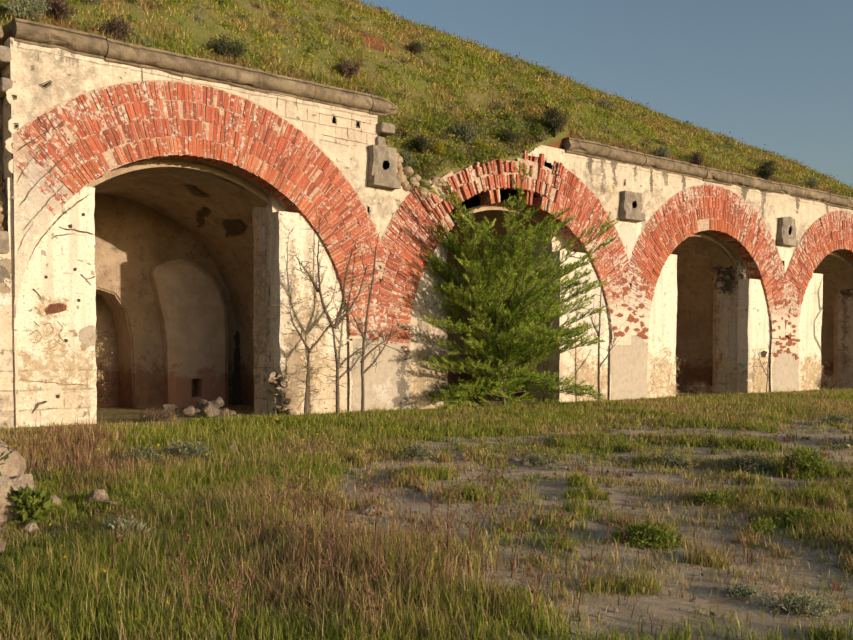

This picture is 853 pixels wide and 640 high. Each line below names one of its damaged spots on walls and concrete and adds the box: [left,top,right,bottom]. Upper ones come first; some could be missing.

flaking render [0,258,12,294]
spalling [45,303,67,315]